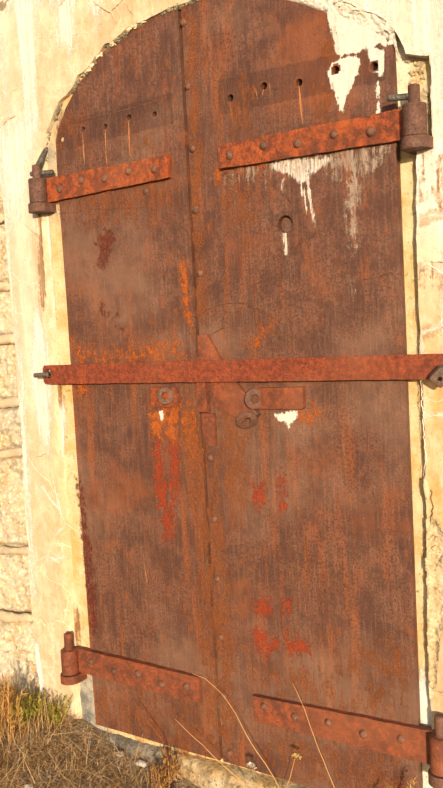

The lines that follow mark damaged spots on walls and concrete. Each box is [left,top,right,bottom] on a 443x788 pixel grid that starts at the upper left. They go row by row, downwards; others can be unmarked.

crack [37,0,134,38]
spalling [160,0,198,15]
spalling [288,0,432,116]
damp [347,0,443,160]
crack [417,155,443,224]
crack [418,259,443,354]
crack [420,379,443,523]
spalling [425,516,443,700]